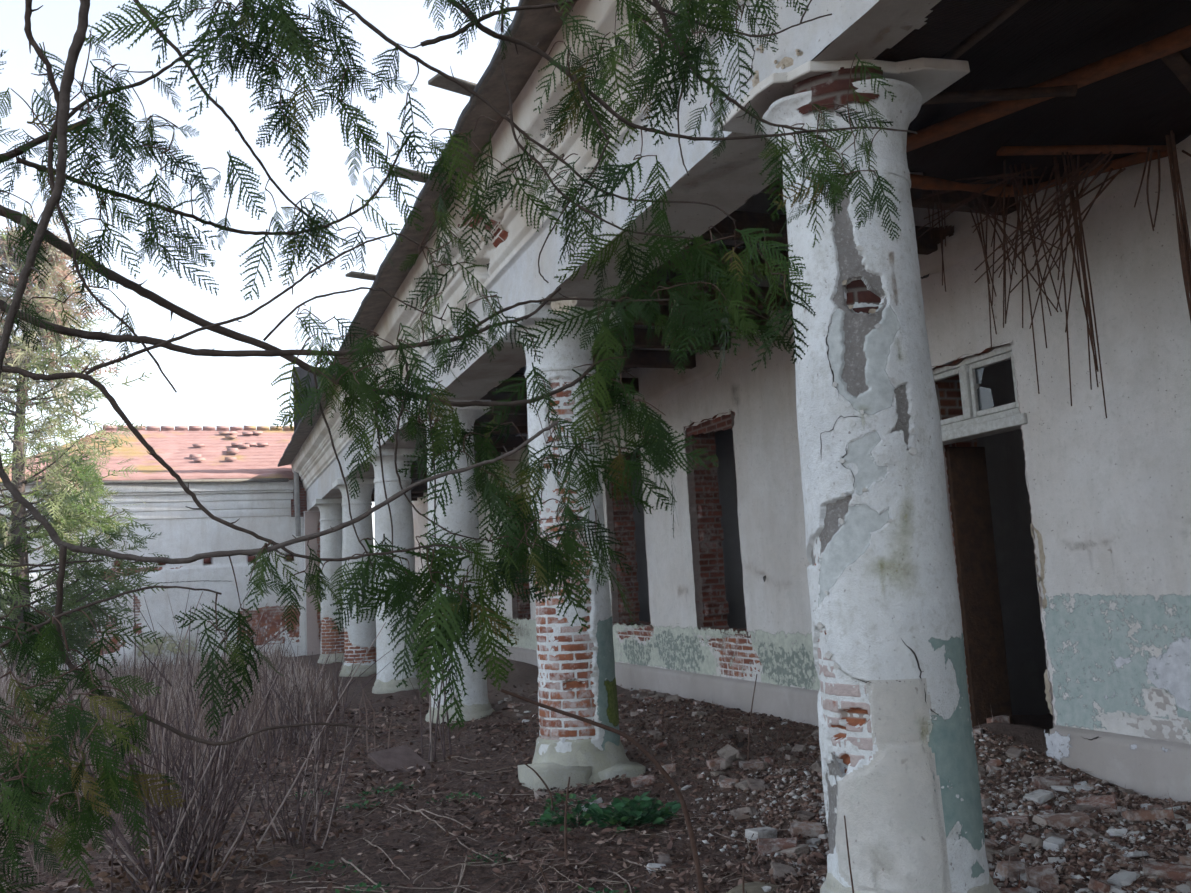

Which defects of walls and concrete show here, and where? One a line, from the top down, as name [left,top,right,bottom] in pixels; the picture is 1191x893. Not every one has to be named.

flaking render [550,296,577,314]
crack [820,323,862,487]
flaking render [811,174,917,606]
flaking render [484,378,873,854]
peeling [928,633,985,850]
peeling [1030,524,1191,761]